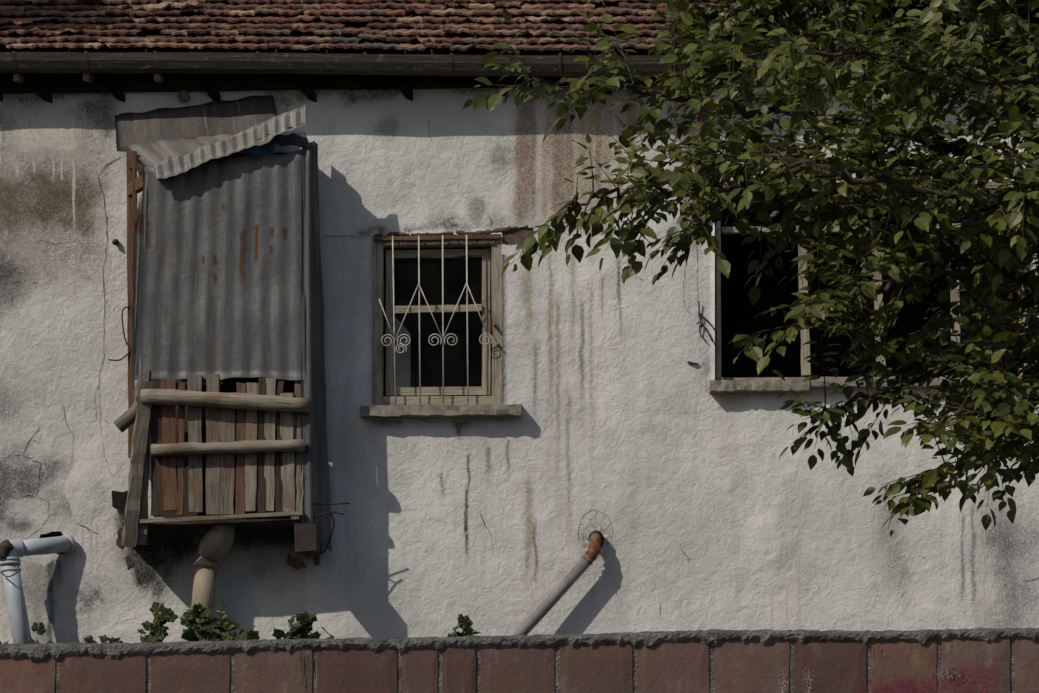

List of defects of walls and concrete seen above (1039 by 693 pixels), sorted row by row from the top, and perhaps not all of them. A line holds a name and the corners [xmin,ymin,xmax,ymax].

leakage [0,93,125,317]
flaking render [374,225,534,245]
leakage [357,85,694,245]
crack [43,157,120,476]
leakage [522,244,623,525]
leakage [0,442,97,560]
crack [0,406,101,539]
leakage [21,559,109,643]
flaking render [116,510,135,570]
leakage [110,515,208,601]
leakage [366,417,516,564]
leakage [959,493,1039,629]